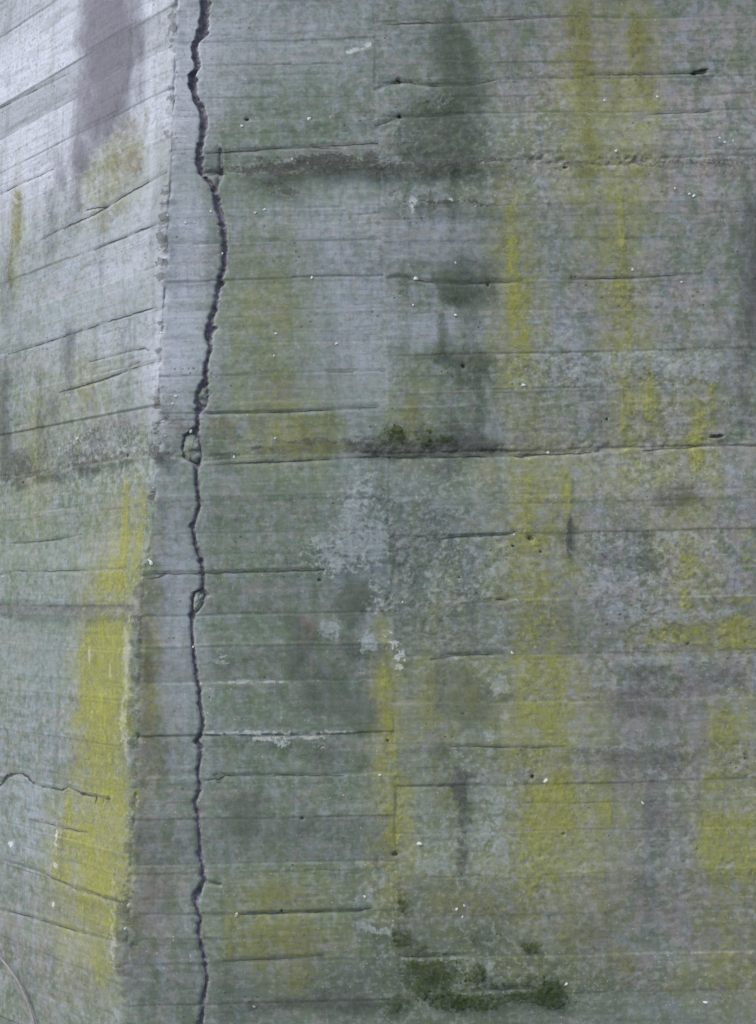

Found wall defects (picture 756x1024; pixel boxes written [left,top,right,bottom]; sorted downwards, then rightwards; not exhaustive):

water stain [71,0,140,169]
crack [312,118,395,149]
crack [359,451,486,459]
crack [515,451,591,459]
crack [0,0,374,1024]